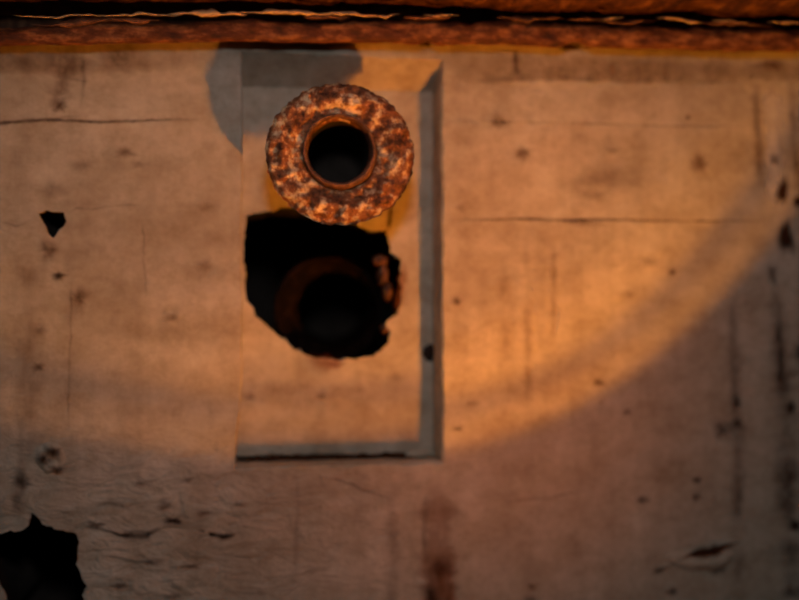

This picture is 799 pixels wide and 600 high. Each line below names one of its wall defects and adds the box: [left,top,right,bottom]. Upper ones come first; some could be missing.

spalling [38,210,66,238]
spalling [0,513,87,600]